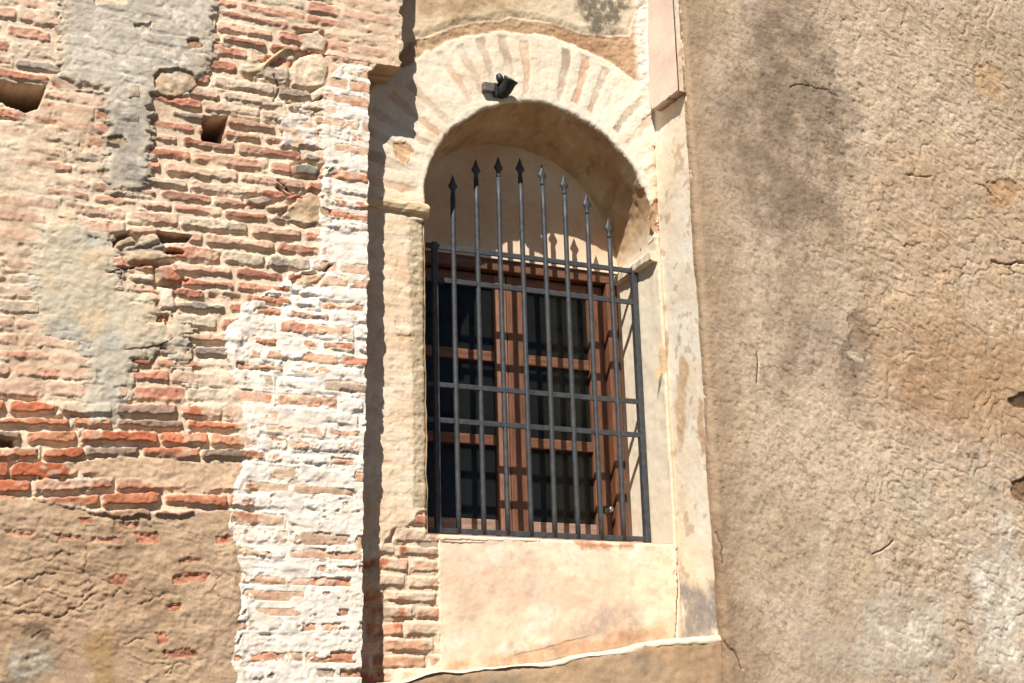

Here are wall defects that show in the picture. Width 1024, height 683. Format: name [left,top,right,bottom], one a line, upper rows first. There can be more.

spalling [129,84,140,98]
spalling [154,69,197,98]
damp [740,12,822,230]
spalling [105,136,127,150]
spalling [985,177,1022,211]
damp [838,266,859,362]
peeling [215,64,440,683]